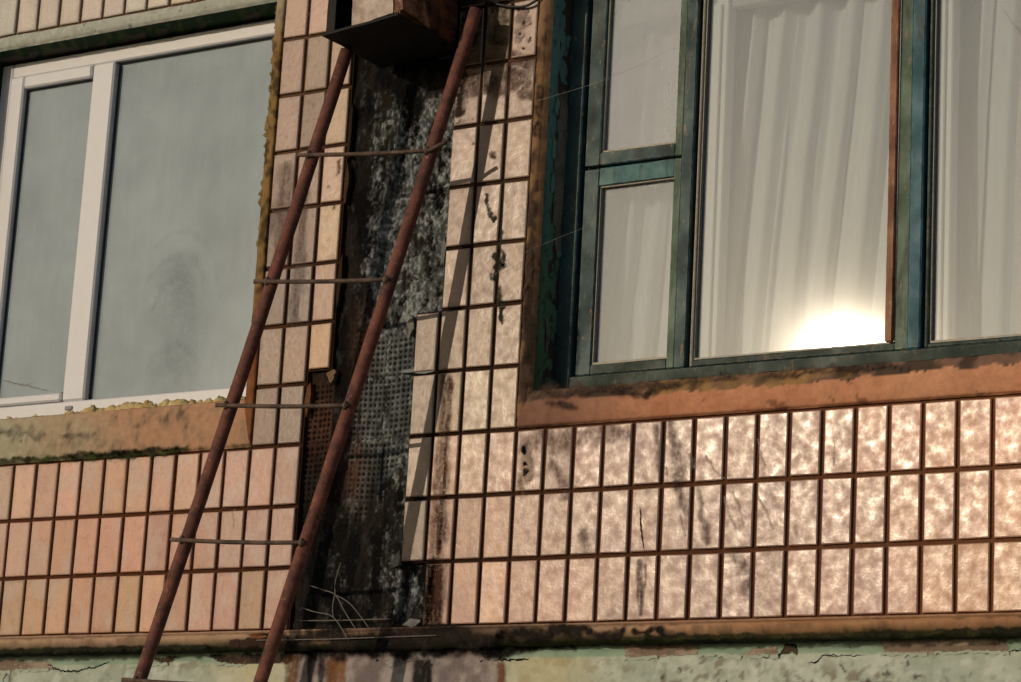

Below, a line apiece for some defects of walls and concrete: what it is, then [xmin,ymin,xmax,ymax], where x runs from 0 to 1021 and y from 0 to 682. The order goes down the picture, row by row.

leakage [460,0,540,136]
peeling [550,89,568,258]
leakage [521,200,732,409]
leakage [656,421,709,544]
leakage [278,558,684,682]
crack [763,643,861,664]